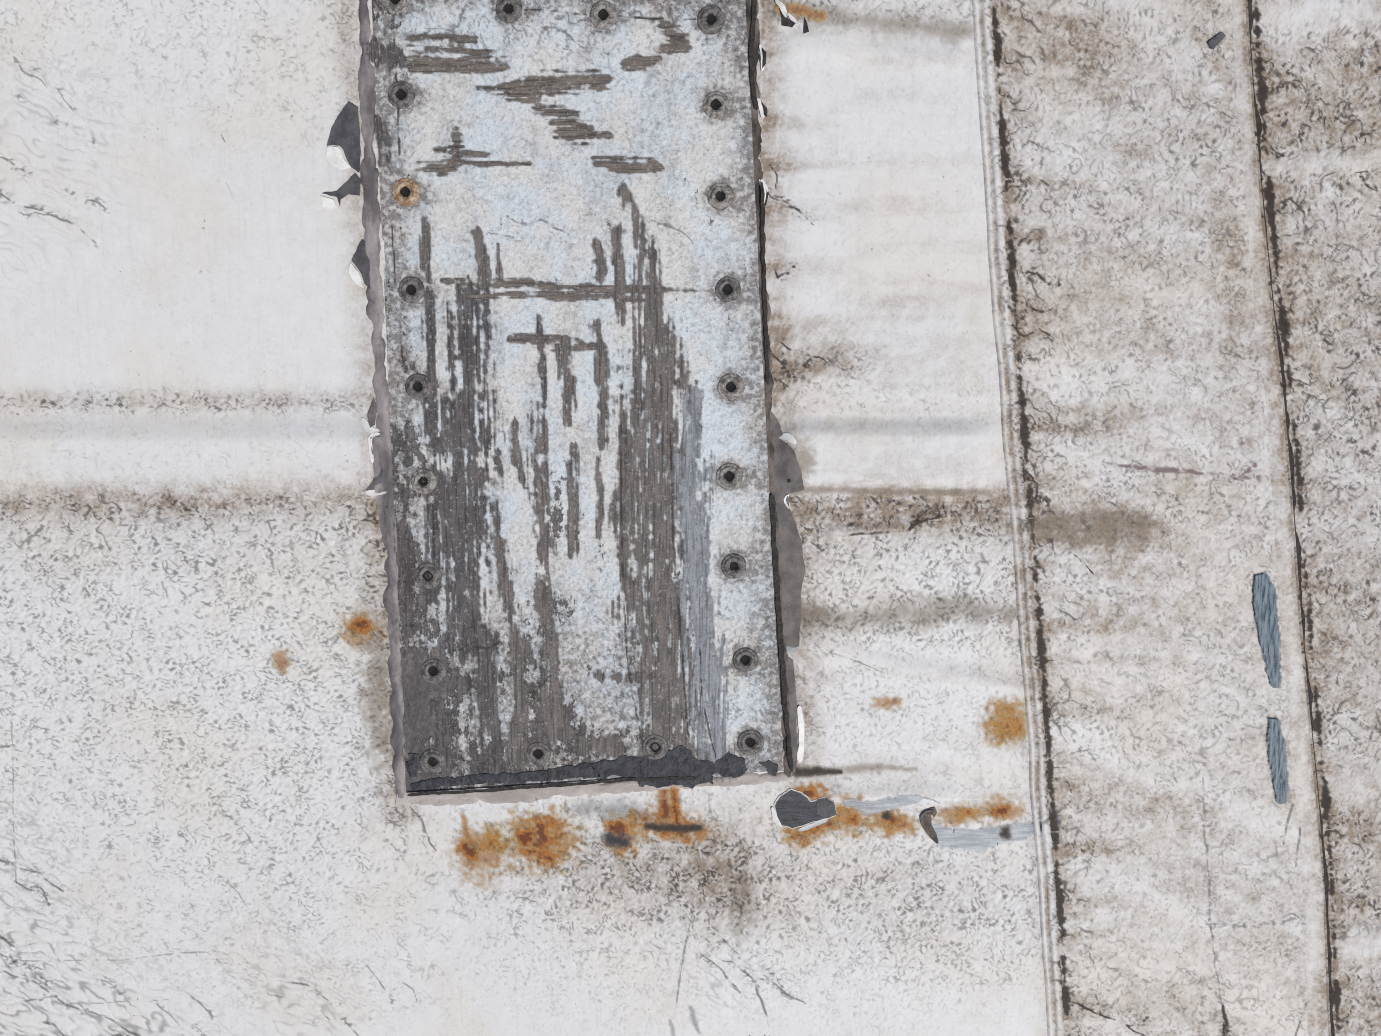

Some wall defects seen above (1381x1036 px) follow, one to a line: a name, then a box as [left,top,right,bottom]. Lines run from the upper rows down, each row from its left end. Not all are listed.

peeling [775,0,809,33]
peeling [757,98,768,119]
peeling [321,101,391,212]
peeling [362,17,735,787]
peeling [770,411,806,775]
corrosion [343,613,383,645]
corrosion [984,700,1026,746]
corrosion [456,806,582,880]
corrosion [604,786,713,857]
peeling [771,807,829,832]
corrosion [782,782,1022,848]